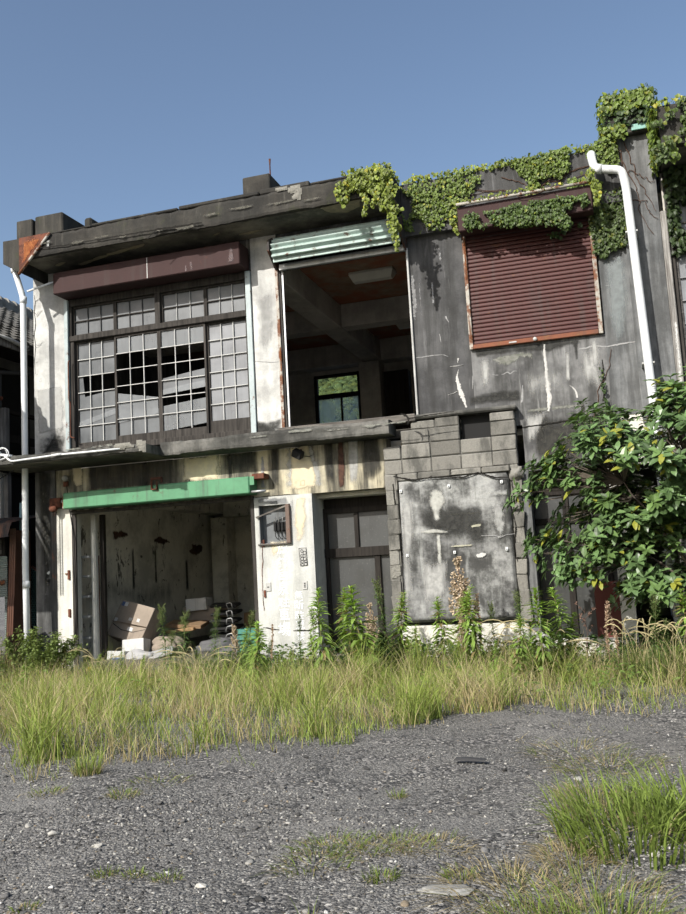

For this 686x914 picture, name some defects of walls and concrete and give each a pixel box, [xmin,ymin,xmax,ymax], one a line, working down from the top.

corrosion [23,239,38,261]
water stain [521,257,635,461]
water stain [261,443,334,488]
water stain [348,441,358,480]
water stain [490,490,507,538]
water stain [403,490,446,606]